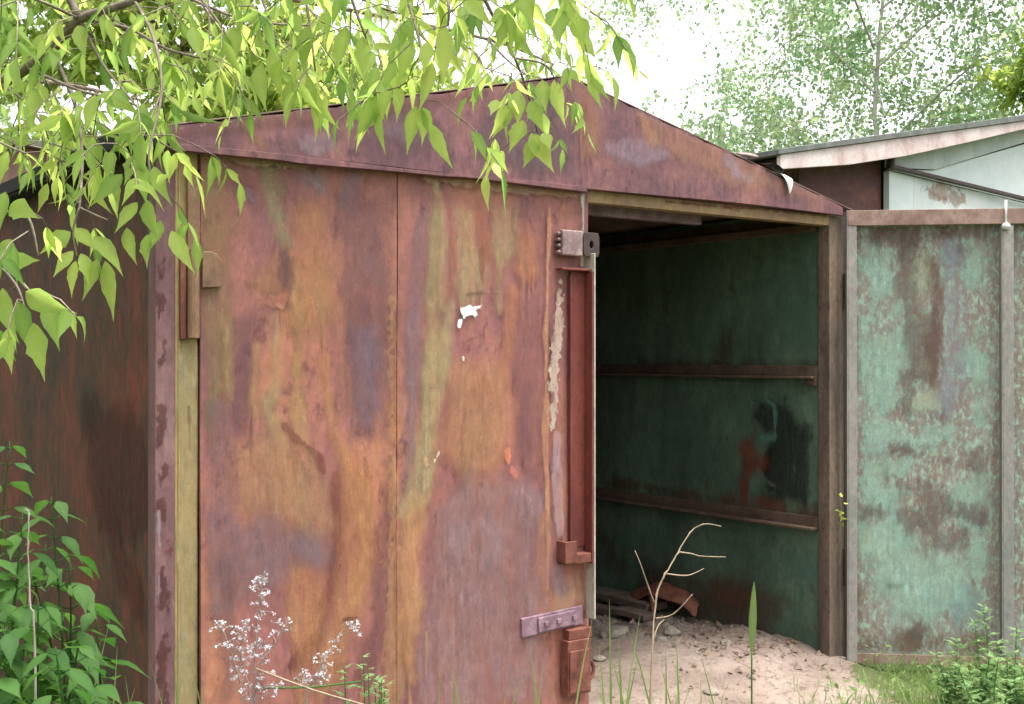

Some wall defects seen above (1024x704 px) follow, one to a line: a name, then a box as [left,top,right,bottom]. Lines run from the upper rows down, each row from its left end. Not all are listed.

corrosion [282,423,375,702]
corrosion [395,331,448,522]
peeling [457,305,481,328]
corrosion [520,213,551,367]
corrosion [538,389,550,590]
peeling [547,279,563,533]
corrosion [887,623,986,651]